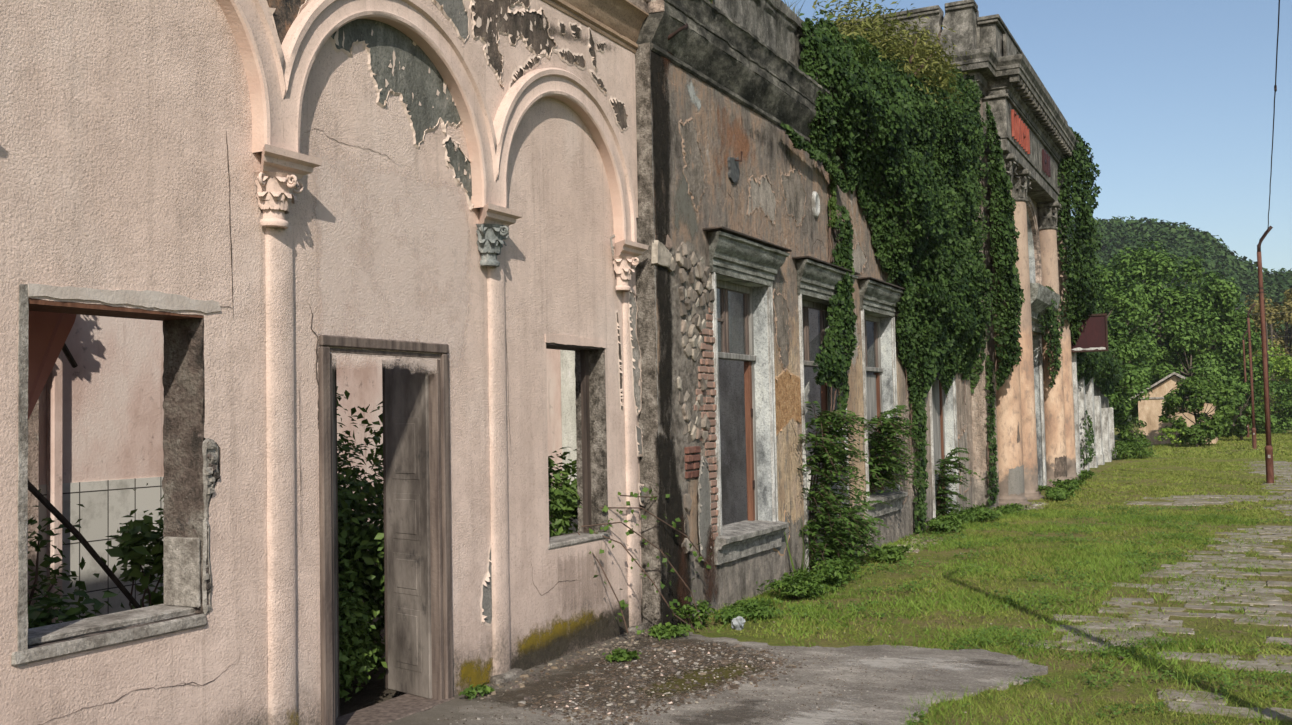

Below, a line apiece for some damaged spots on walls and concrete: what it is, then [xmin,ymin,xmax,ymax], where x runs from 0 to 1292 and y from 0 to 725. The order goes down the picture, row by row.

peeling [264,0,308,45]
peeling [432,0,629,132]
peeling [328,19,476,212]
leakage [457,50,776,725]
peeling [480,540,494,626]
crack [38,657,240,725]
leakage [787,701,866,725]